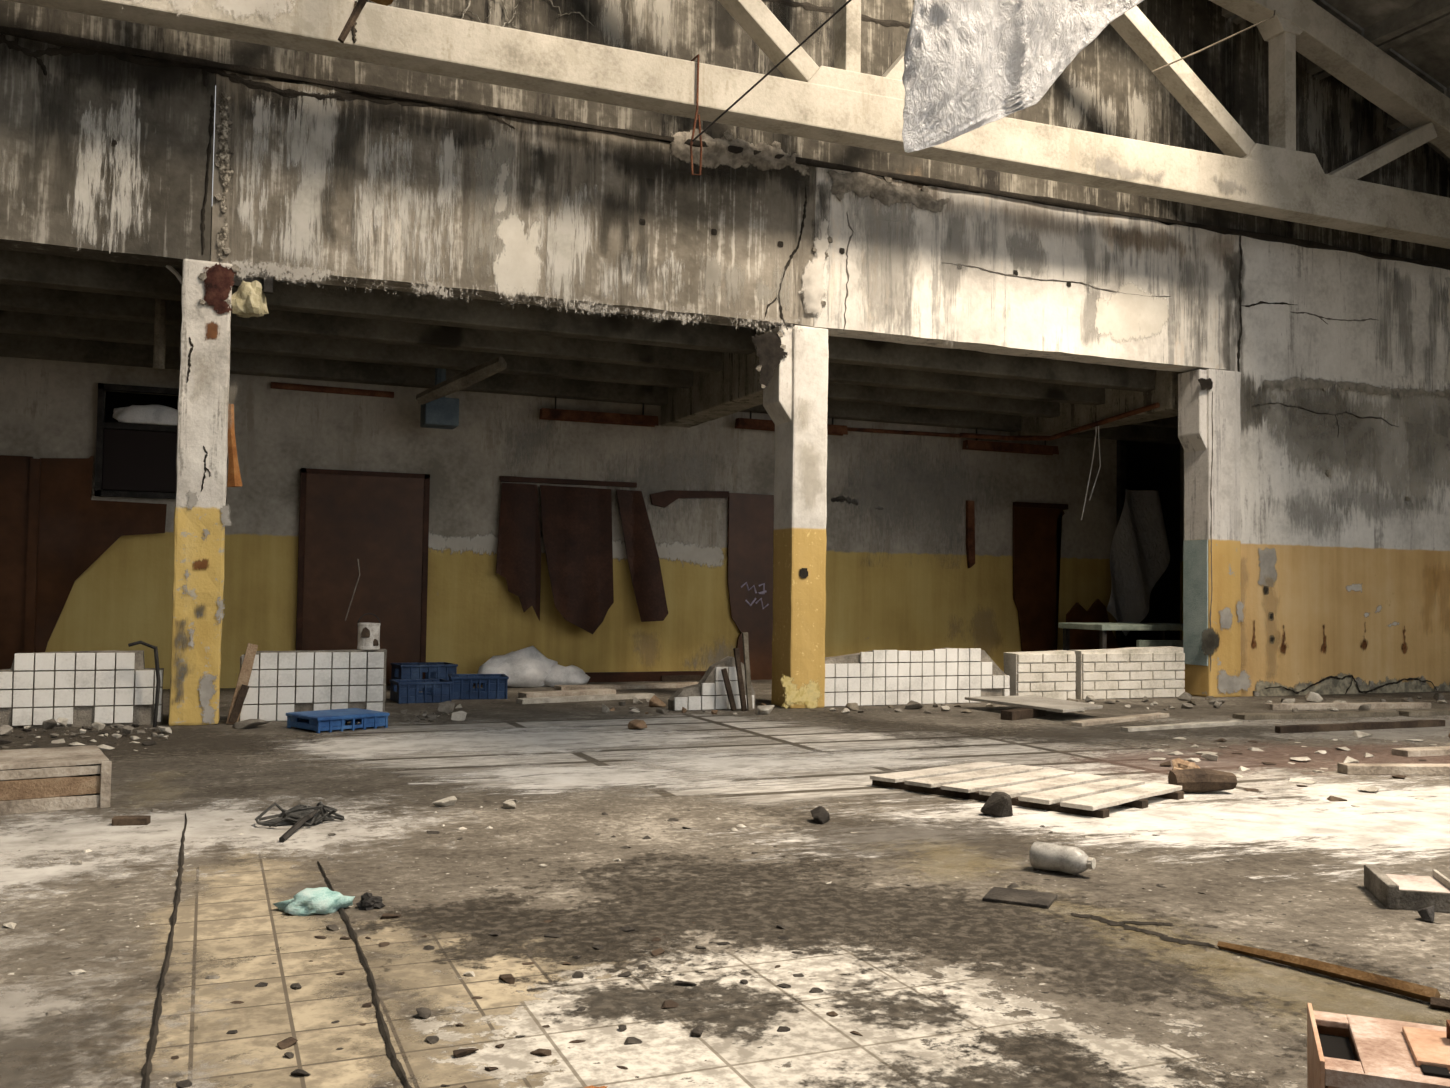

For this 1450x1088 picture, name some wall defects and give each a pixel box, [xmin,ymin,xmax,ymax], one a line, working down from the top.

water stain [0,37,209,252]
water stain [1064,75,1149,142]
water stain [227,88,829,331]
crack [765,186,807,330]
crack [843,213,854,331]
crack [1210,235,1399,671]
peeling [201,505,233,540]
peeling [1258,548,1278,587]
peeling [175,569,225,725]
peeling [1201,599,1245,656]
spalling [1217,669,1450,696]